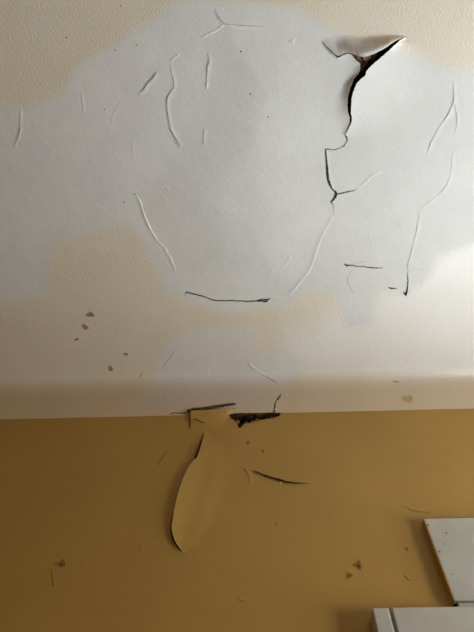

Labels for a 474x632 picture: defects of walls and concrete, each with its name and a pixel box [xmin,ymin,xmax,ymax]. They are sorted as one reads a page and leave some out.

spalling [347,38,403,122]
crack [185,289,296,302]
peeling [170,394,284,552]
crack [244,467,308,488]